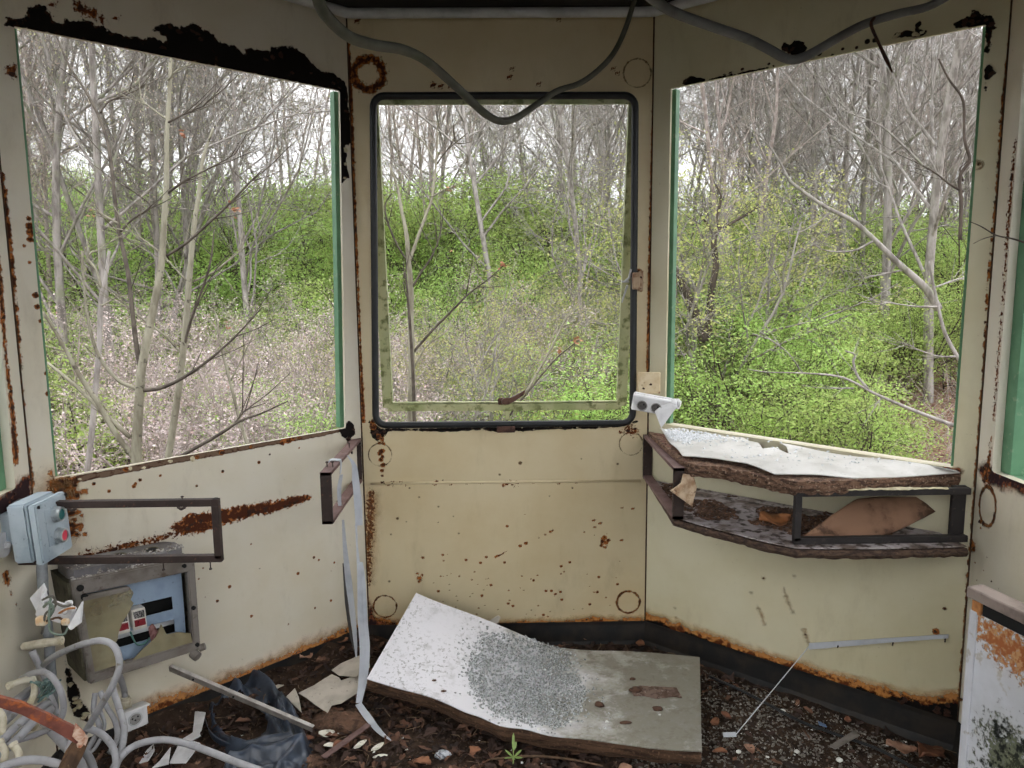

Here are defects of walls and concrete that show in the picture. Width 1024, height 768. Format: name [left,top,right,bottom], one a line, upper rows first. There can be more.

corrosion [0,0,420,586]
corrosion [147,595,400,714]
peeling [341,144,349,183]
corrosion [497,10,1024,721]